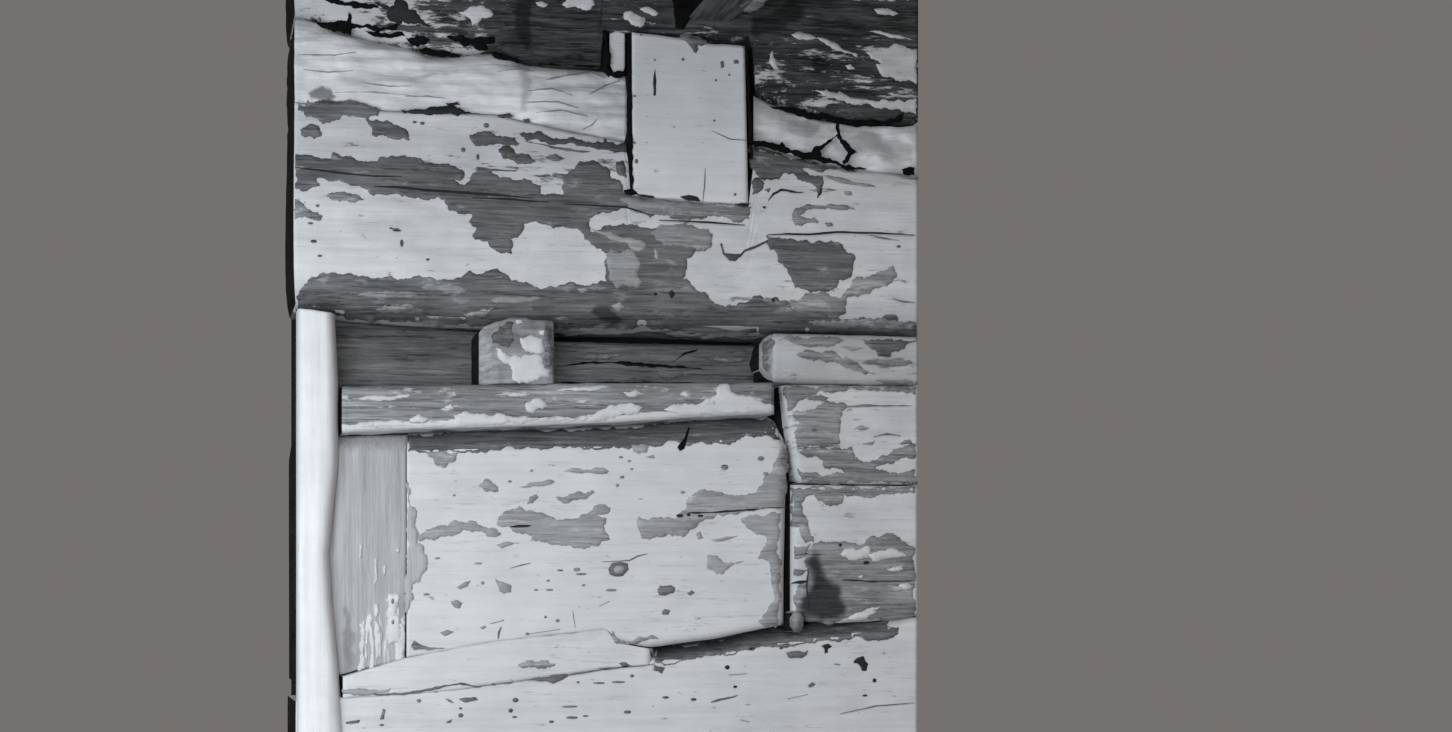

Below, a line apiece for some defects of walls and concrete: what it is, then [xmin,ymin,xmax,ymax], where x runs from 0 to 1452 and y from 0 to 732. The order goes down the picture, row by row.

peeling [458,5,493,26]
peeling [623,6,658,36]
peeling [680,33,707,61]
peeling [295,99,917,696]
peeling [342,688,391,726]
spalling [445,697,478,723]